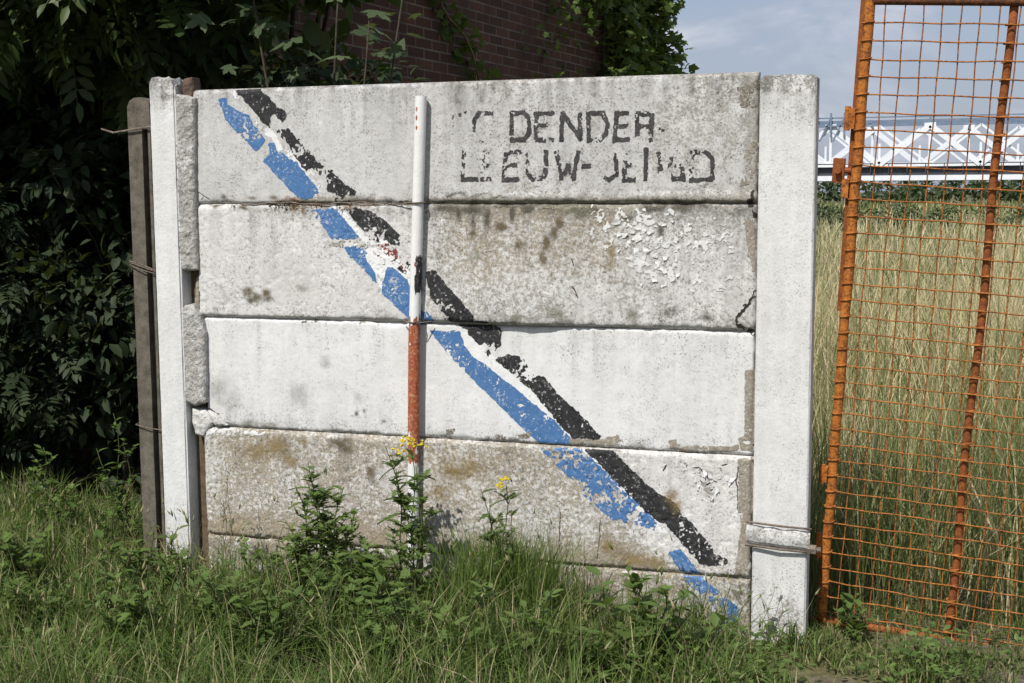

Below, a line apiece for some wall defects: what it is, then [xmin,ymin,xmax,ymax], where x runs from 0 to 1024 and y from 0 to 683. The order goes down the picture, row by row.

damp [437,192,538,236]
damp [539,217,563,262]
peeling [538,141,759,297]
damp [244,287,271,302]
crack [735,290,757,335]
corrosion [408,328,420,434]
spalling [192,406,265,437]
spalling [668,369,755,606]